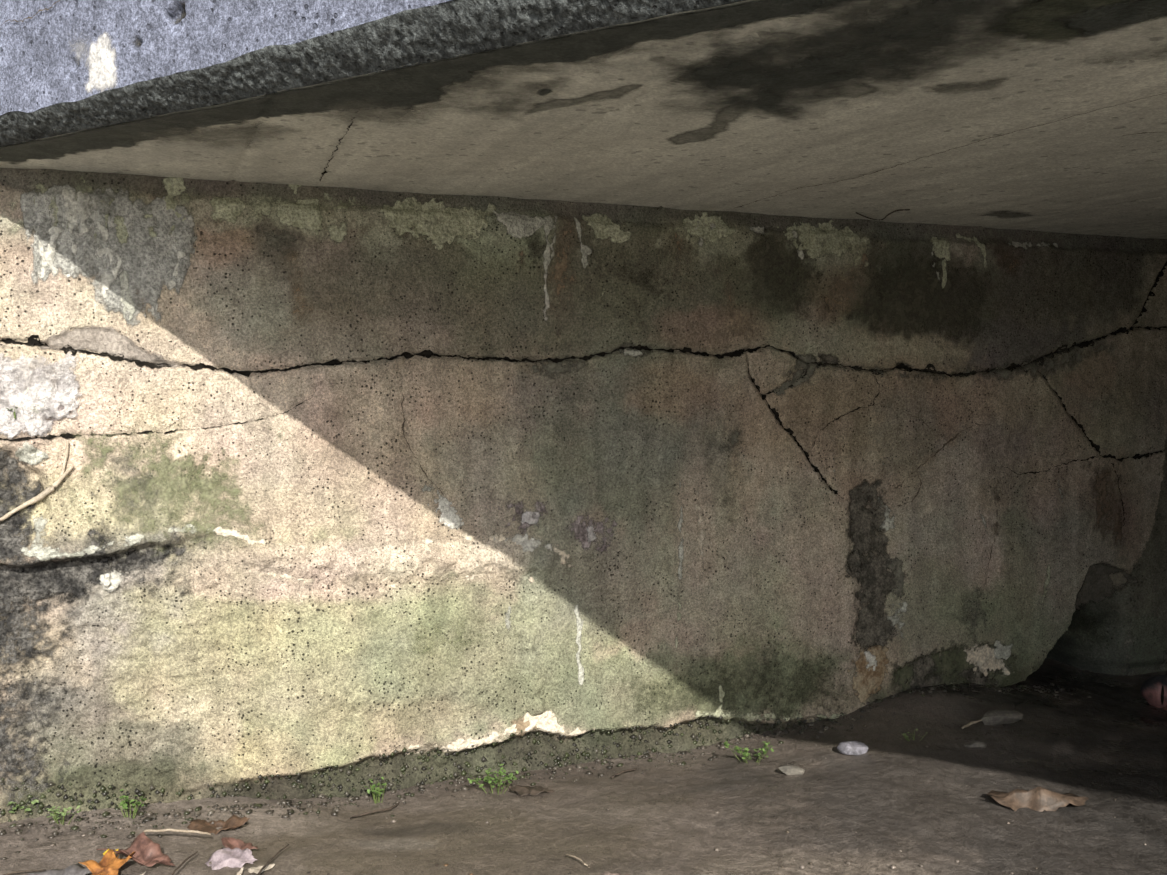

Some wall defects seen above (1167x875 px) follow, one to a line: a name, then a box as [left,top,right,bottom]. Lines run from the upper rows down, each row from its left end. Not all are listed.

damp [1046,0,1167,43]
damp [0,0,1020,164]
damp [12,176,197,326]
damp [380,196,558,320]
damp [748,220,991,343]
crack [0,262,1167,591]
damp [21,517,144,562]
damp [168,524,266,545]
damp [100,571,121,592]
spalling [1075,563,1138,611]
damp [696,685,846,722]
damp [405,710,595,754]